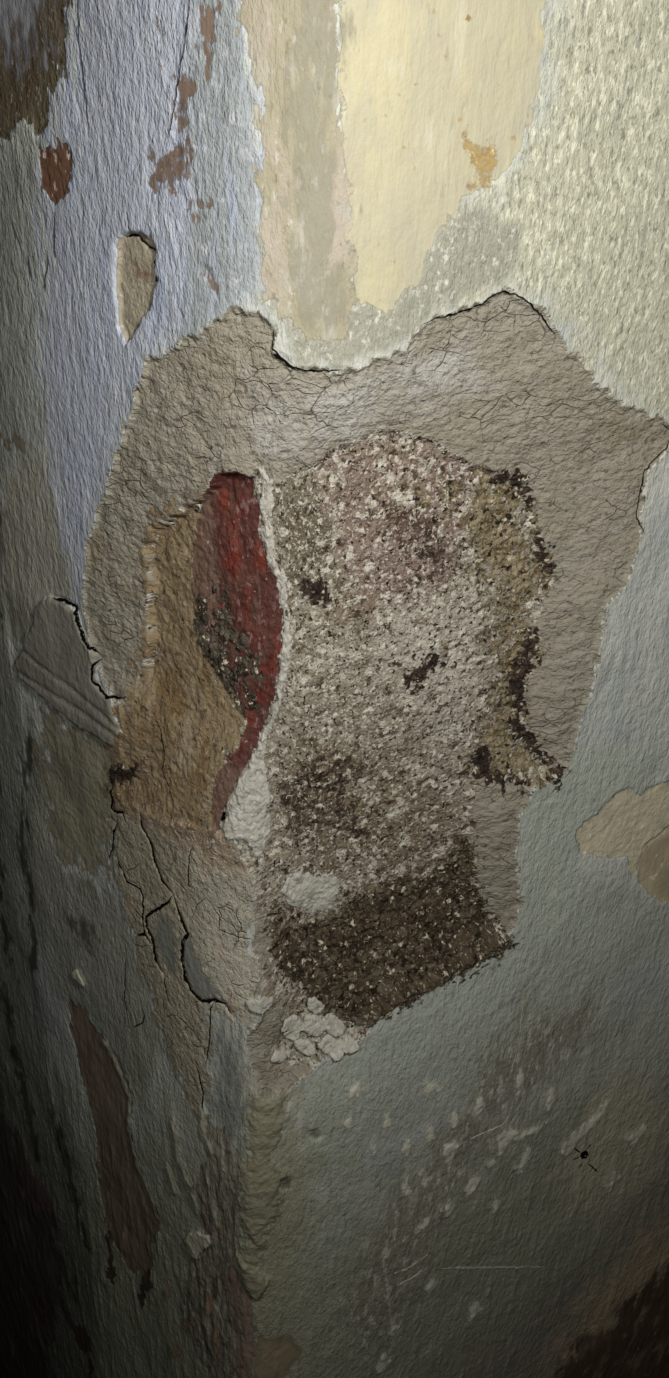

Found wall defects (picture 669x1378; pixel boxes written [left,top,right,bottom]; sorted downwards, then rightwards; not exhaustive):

peeling [0,0,90,289]
spalling [28,0,669,1101]
crack [53,597,127,699]
crack [154,717,174,804]
crack [109,786,249,1109]
damp [263,821,521,1040]
peeling [399,1093,485,1158]
peeling [414,1086,555,1235]
peeling [560,1096,612,1156]
damp [104,1231,117,1284]
damp [137,1267,153,1309]
damp [556,1263,669,1378]